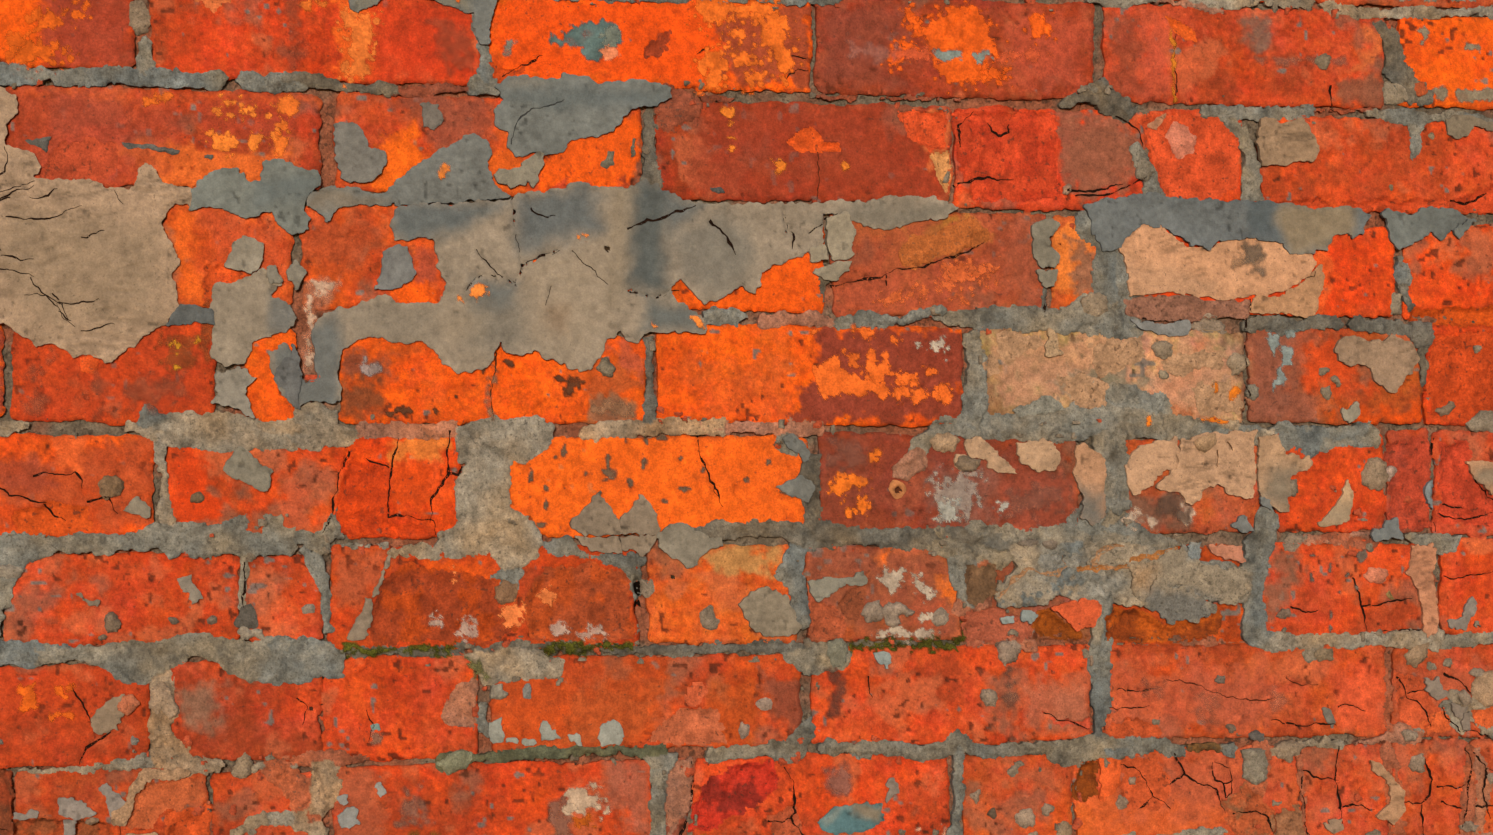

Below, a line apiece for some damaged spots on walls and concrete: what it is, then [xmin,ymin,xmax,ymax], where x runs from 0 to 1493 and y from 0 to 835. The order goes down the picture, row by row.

crack [0,146,35,201]
flaking render [0,0,1064,418]
crack [466,198,679,305]
crack [627,206,736,255]
crack [783,152,838,249]
flaking render [1082,112,1493,337]
spalling [1333,304,1493,424]
crack [696,435,723,507]
flaking render [953,429,1313,645]
flaking render [1317,479,1354,527]
spalling [1370,437,1493,638]
crack [1044,672,1493,835]